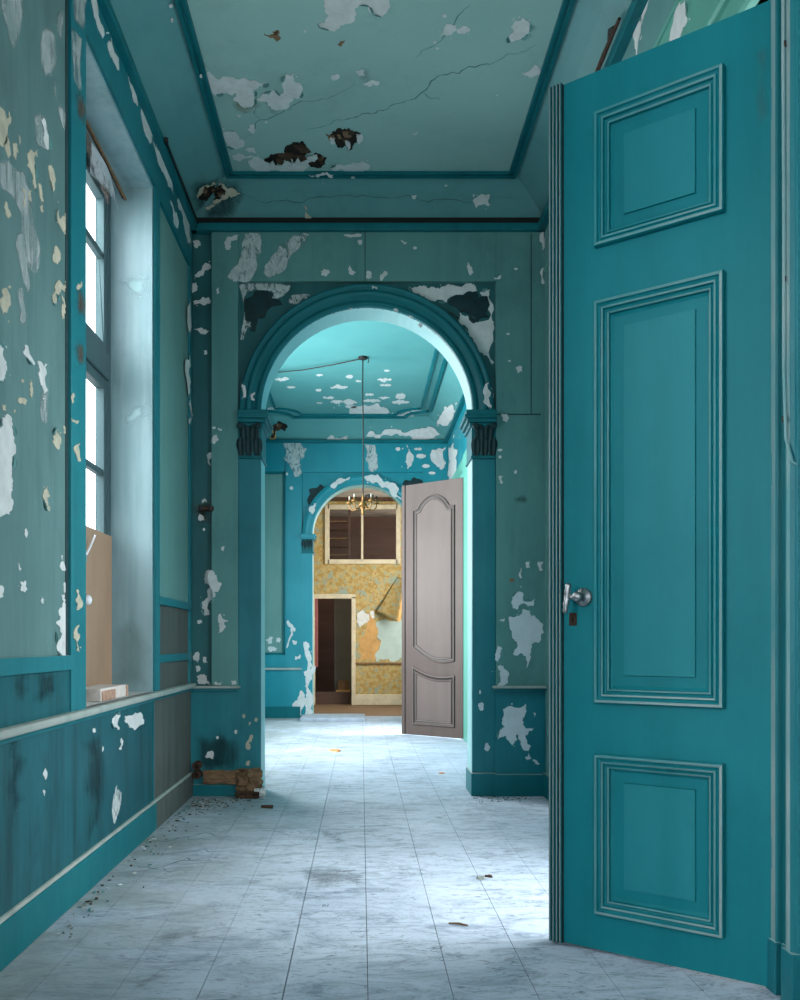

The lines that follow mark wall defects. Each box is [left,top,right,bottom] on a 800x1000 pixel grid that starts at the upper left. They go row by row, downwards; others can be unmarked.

peeling [317,0,390,46]
peeling [200,69,304,117]
crack [247,44,537,137]
peeling [223,121,370,179]
peeling [224,233,310,340]
peeling [408,262,494,365]
peeling [0,342,79,517]
peeling [197,570,228,634]
flaking render [356,610,402,662]
peeling [492,561,544,686]
peeling [111,711,144,750]
peeling [484,703,540,765]